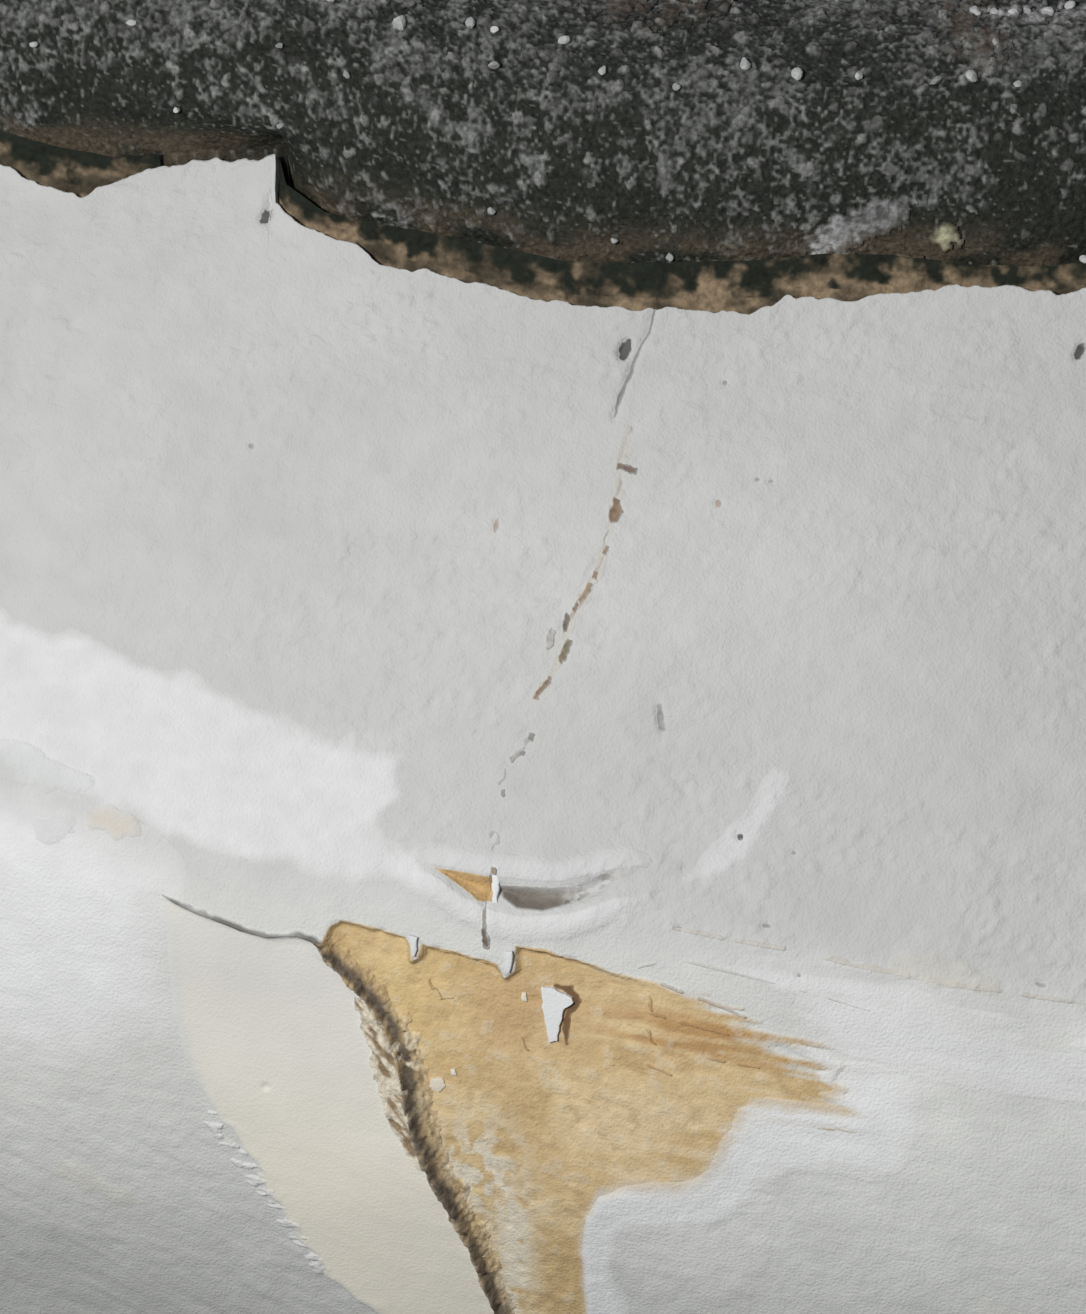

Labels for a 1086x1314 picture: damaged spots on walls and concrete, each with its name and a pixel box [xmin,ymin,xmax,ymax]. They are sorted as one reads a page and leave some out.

spalling [259,209,273,225]
spalling [1073,342,1086,361]
crack [497,309,656,798]
crack [480,831,500,949]
spalling [158,894,929,1314]